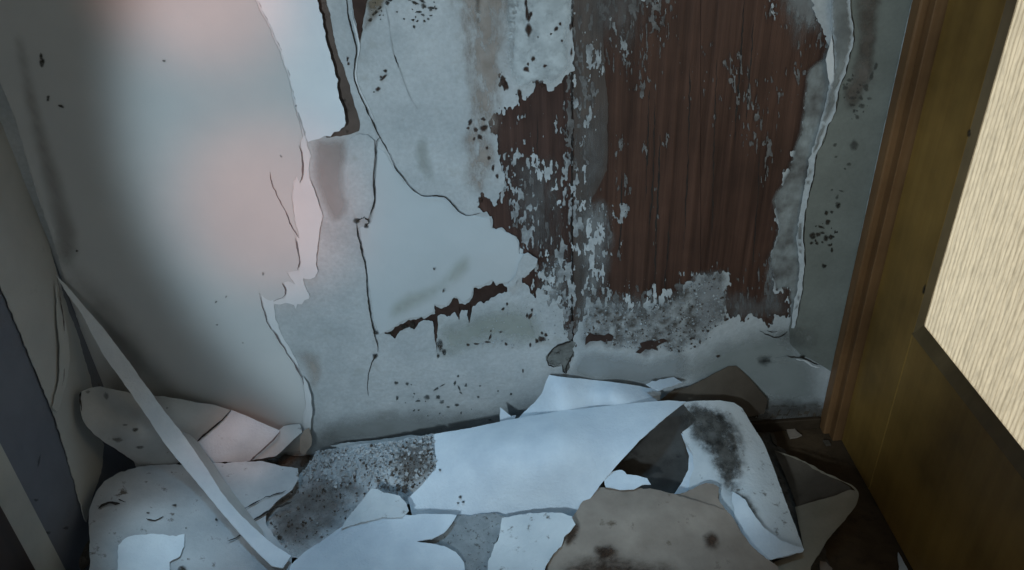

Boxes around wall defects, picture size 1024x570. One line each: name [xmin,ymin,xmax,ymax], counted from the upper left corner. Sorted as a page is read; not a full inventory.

flaking render [352,0,367,42]
peeling [347,134,375,221]
crack [346,0,479,391]
flaking render [385,0,855,374]
leakage [810,189,842,252]